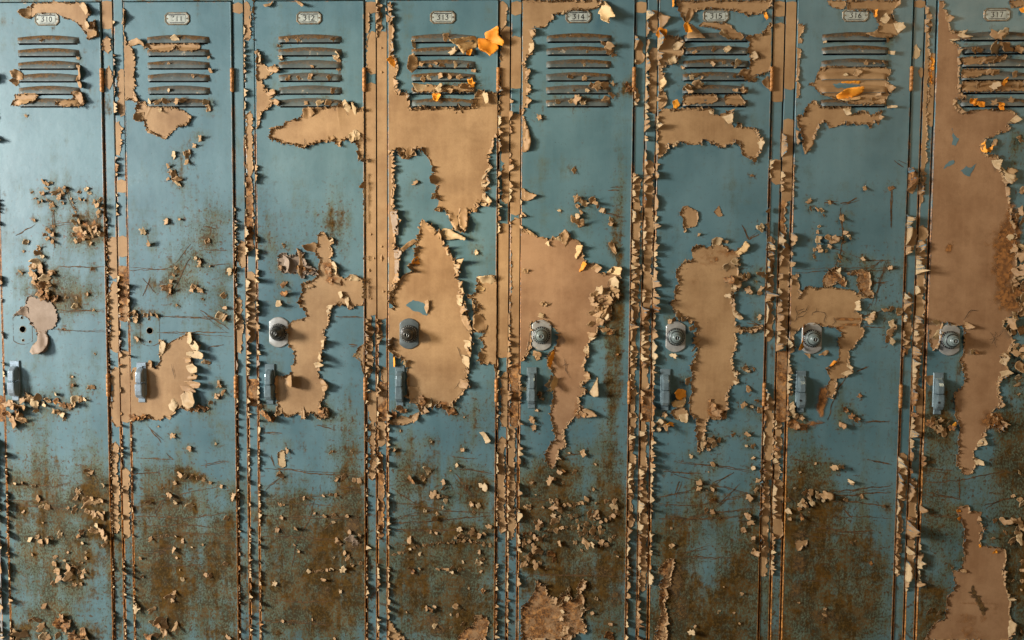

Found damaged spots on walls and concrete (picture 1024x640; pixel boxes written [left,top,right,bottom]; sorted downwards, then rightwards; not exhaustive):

peeling [0,1,226,587]
peeling [215,0,1024,640]